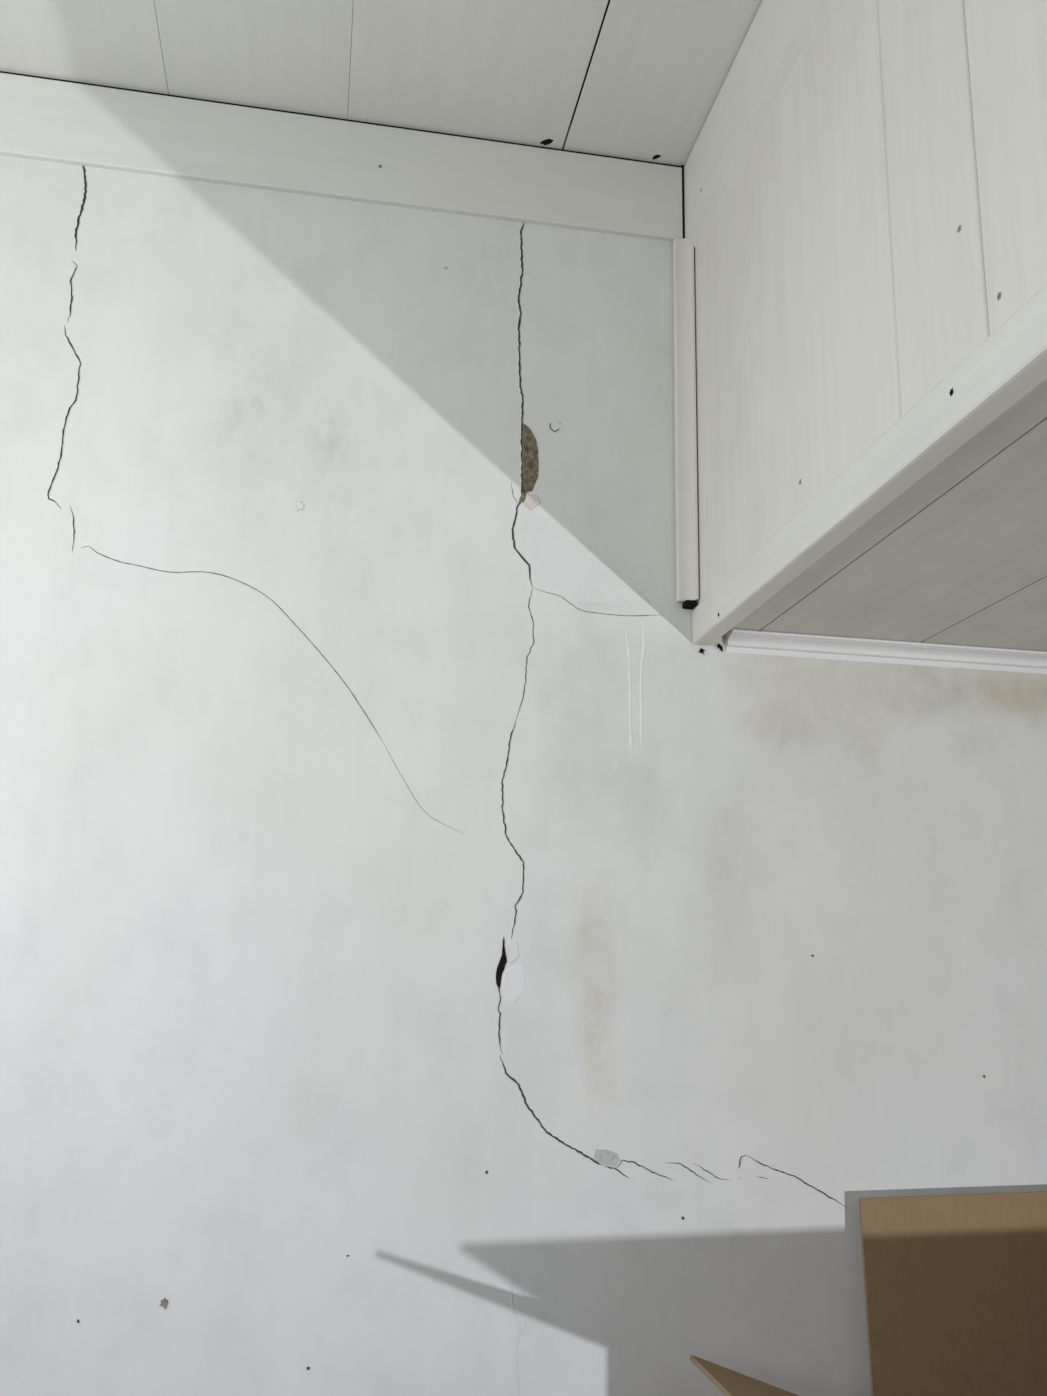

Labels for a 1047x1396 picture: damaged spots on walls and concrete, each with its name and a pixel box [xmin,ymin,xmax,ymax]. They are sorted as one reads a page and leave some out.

crack [47,166,464,834]
flaking render [519,423,540,510]
crack [500,223,657,939]
flaking render [496,937,526,1004]
crack [497,989,846,1207]